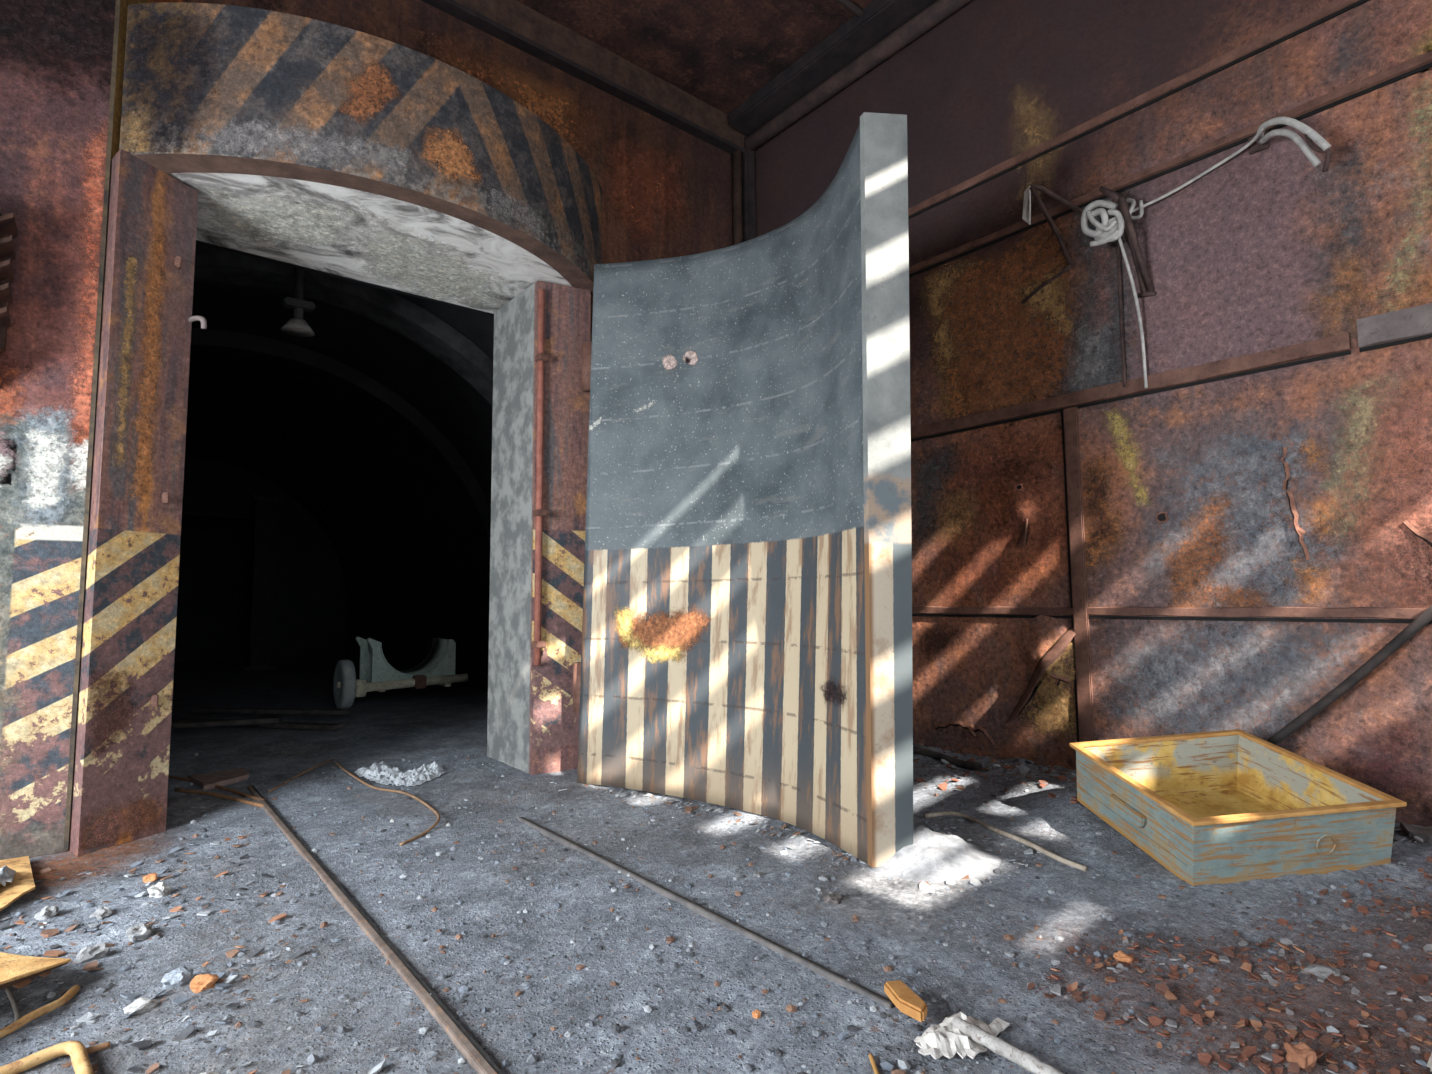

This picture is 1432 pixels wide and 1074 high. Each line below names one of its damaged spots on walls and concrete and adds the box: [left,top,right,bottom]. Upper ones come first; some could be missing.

rust [340,63,399,121]
rust [440,44,588,152]
rust [423,130,481,183]
rust [67,134,106,490]
rust [113,231,166,497]
rust [1083,459,1123,567]
rust [1162,497,1270,608]
rust [1360,393,1432,609]
rust [1024,639,1077,736]